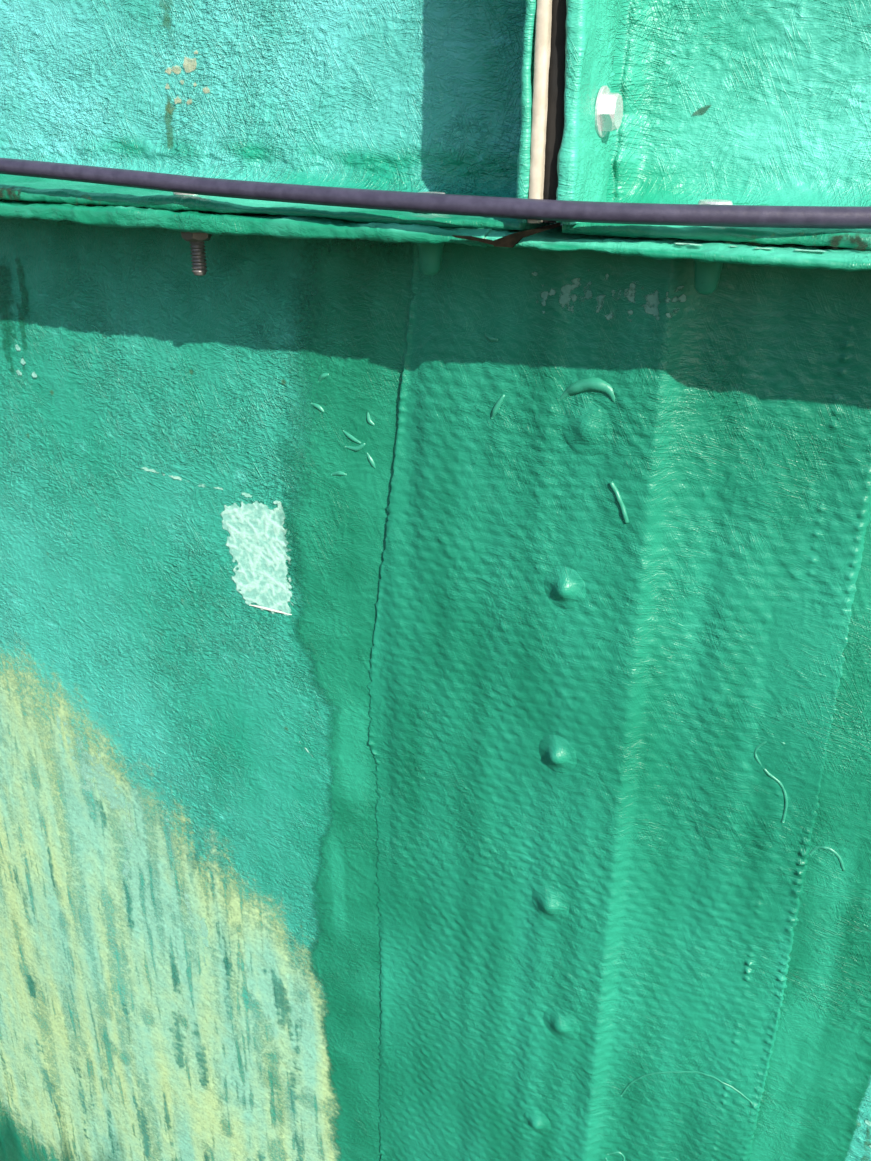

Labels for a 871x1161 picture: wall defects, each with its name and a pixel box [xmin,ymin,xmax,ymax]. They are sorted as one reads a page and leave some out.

rust [165,50,210,148]
peeling [221,500,293,616]